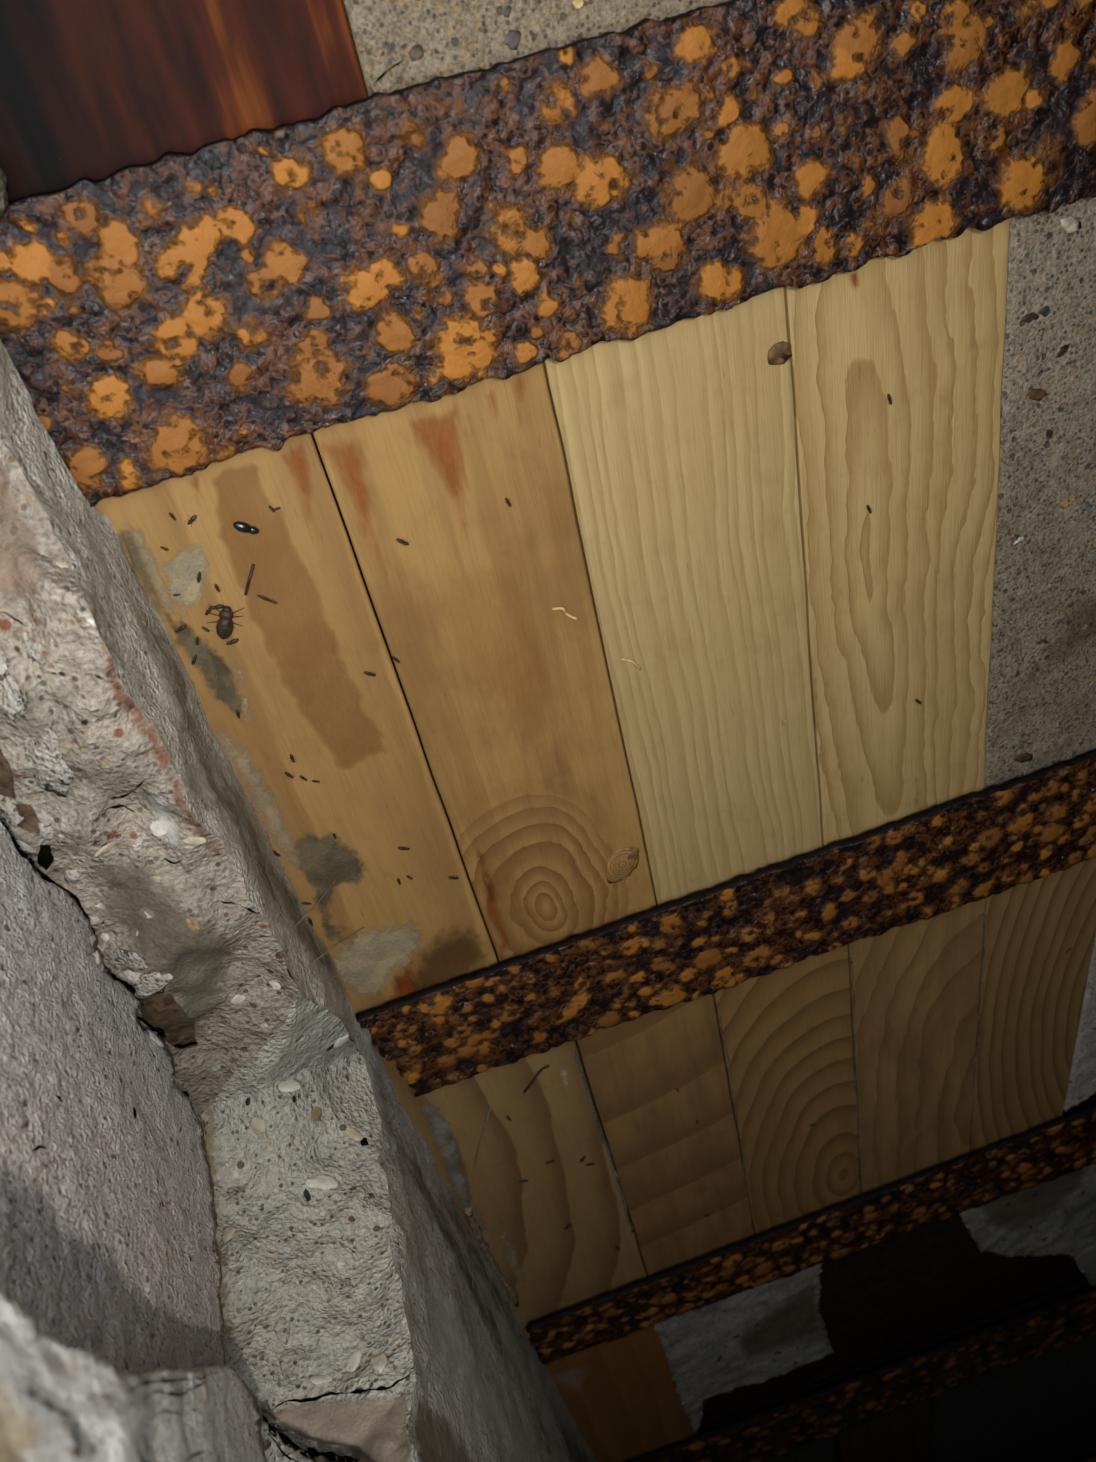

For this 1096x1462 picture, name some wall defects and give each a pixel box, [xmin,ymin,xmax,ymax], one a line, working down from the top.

rust [421,417,459,492]
leakage [121,531,363,969]
crack [263,1372,412,1462]